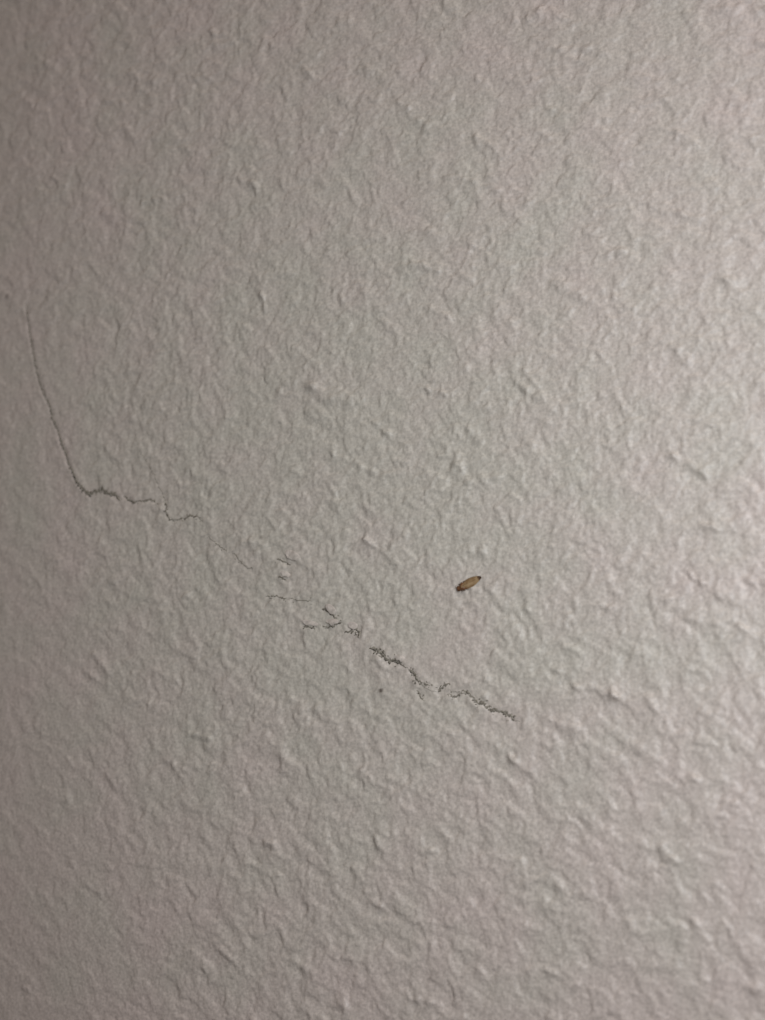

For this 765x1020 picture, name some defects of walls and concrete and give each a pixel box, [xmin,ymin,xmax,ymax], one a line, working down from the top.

crack [26,303,520,722]